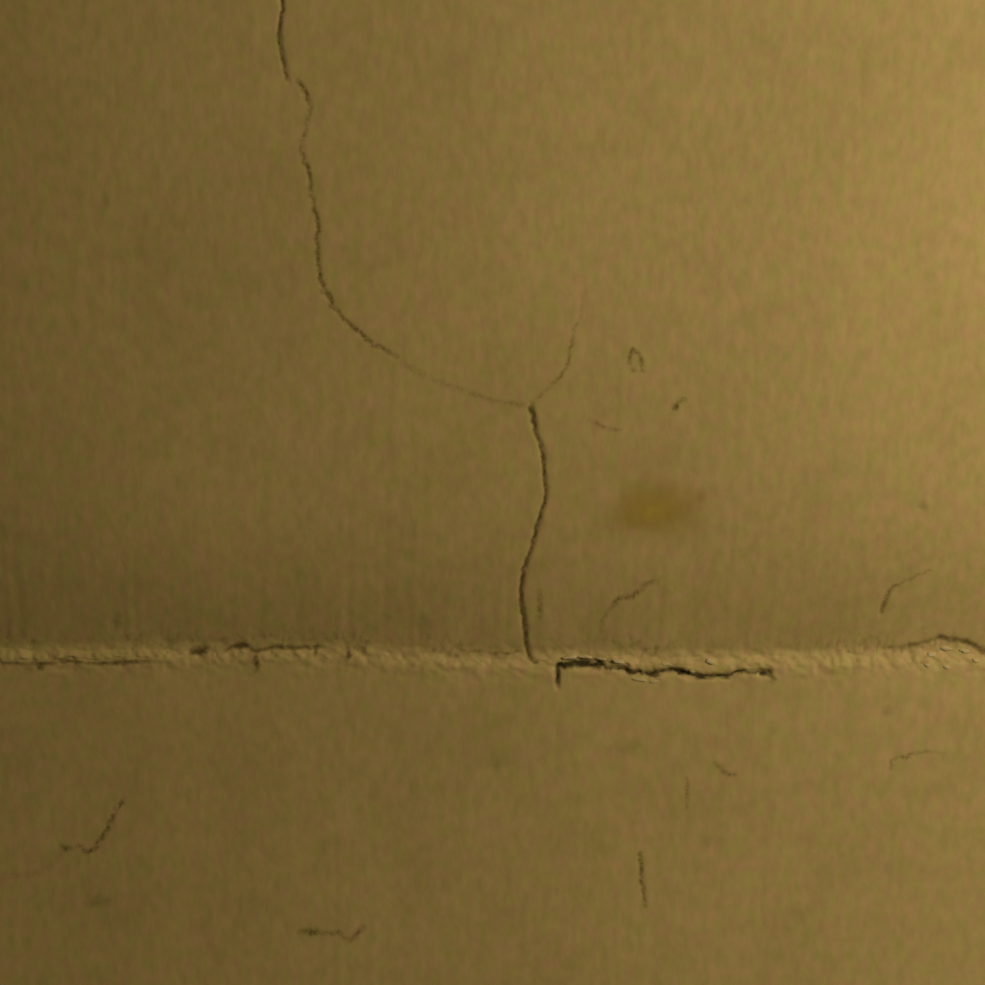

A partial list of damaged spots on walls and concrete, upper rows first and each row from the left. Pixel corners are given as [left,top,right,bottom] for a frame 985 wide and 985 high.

crack [278,0,308,100]
crack [519,407,547,657]